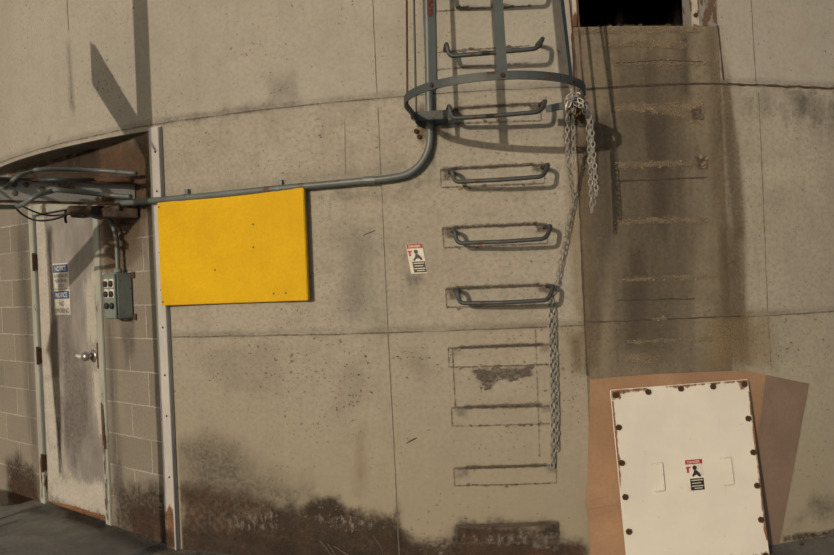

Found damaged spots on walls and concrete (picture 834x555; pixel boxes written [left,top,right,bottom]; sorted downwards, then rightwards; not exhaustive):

water stain [51,323,87,472]
spalling [473,366,534,390]
water stain [7,457,166,549]
corrosion [165,506,175,548]
water stain [182,450,583,555]